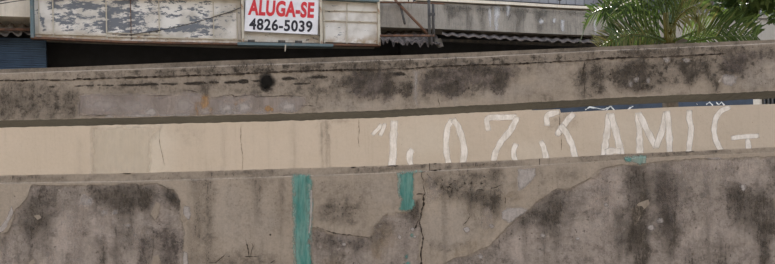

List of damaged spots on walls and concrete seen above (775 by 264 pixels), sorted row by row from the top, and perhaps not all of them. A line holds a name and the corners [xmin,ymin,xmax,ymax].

water stain [66,63,272,115]
water stain [282,58,514,103]
water stain [94,128,156,174]
peeling [0,183,190,264]
peeling [308,201,422,264]
crack [414,169,506,264]
peeling [444,156,775,264]
water stain [604,170,689,264]
water stain [726,185,775,264]